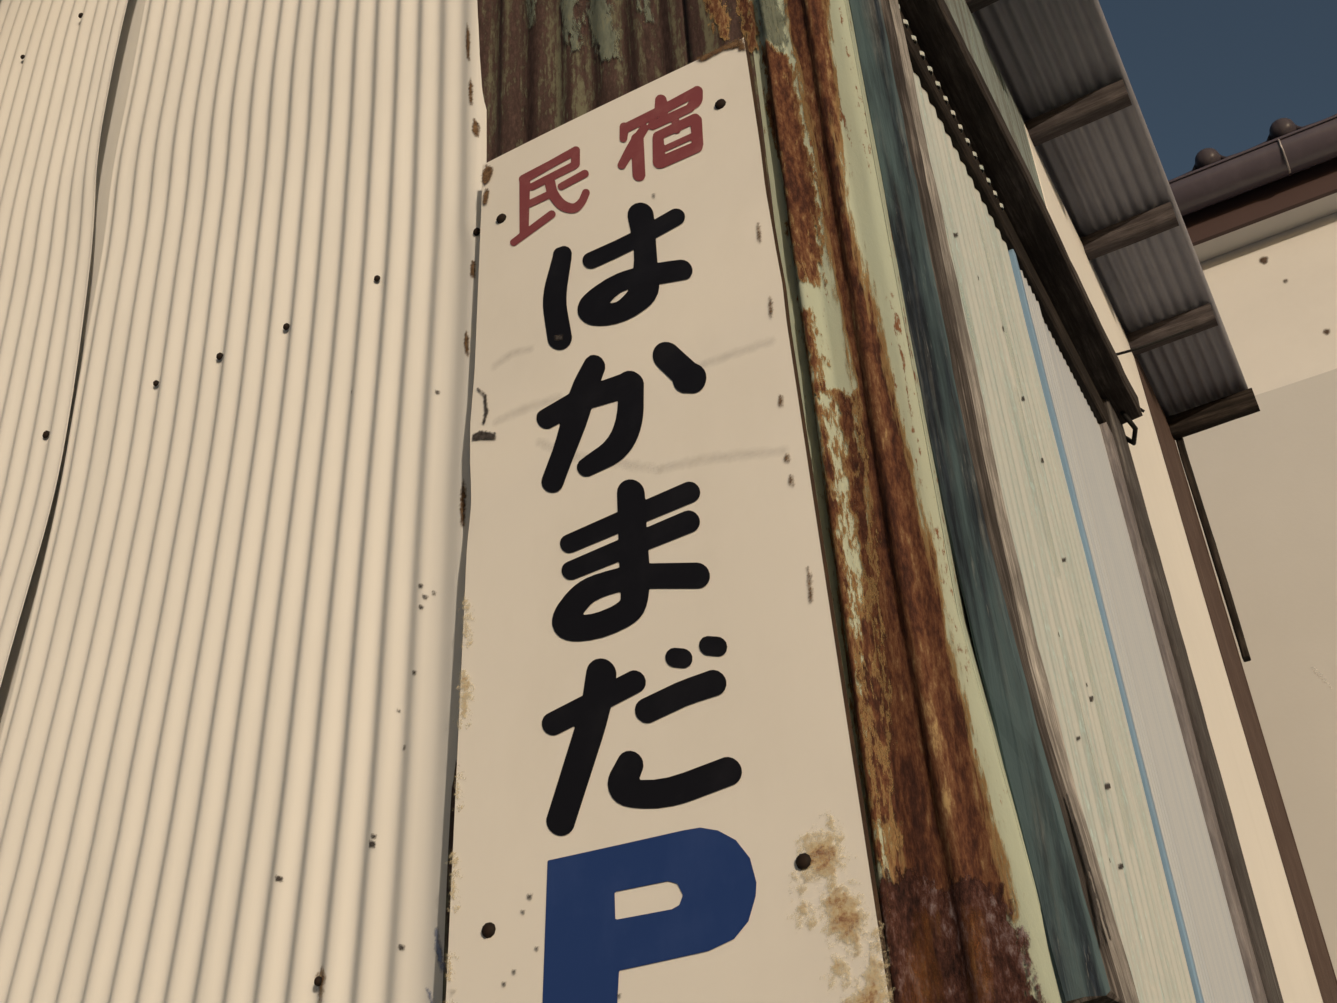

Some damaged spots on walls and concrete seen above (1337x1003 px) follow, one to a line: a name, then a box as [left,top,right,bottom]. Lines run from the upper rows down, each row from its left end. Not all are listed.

peeling [556,0,623,60]
peeling [637,0,654,22]
spalling [697,37,746,61]
peeling [758,0,789,52]
peeling [468,80,480,136]
corrosion [477,0,1046,1003]
corrosion [442,763,462,1003]